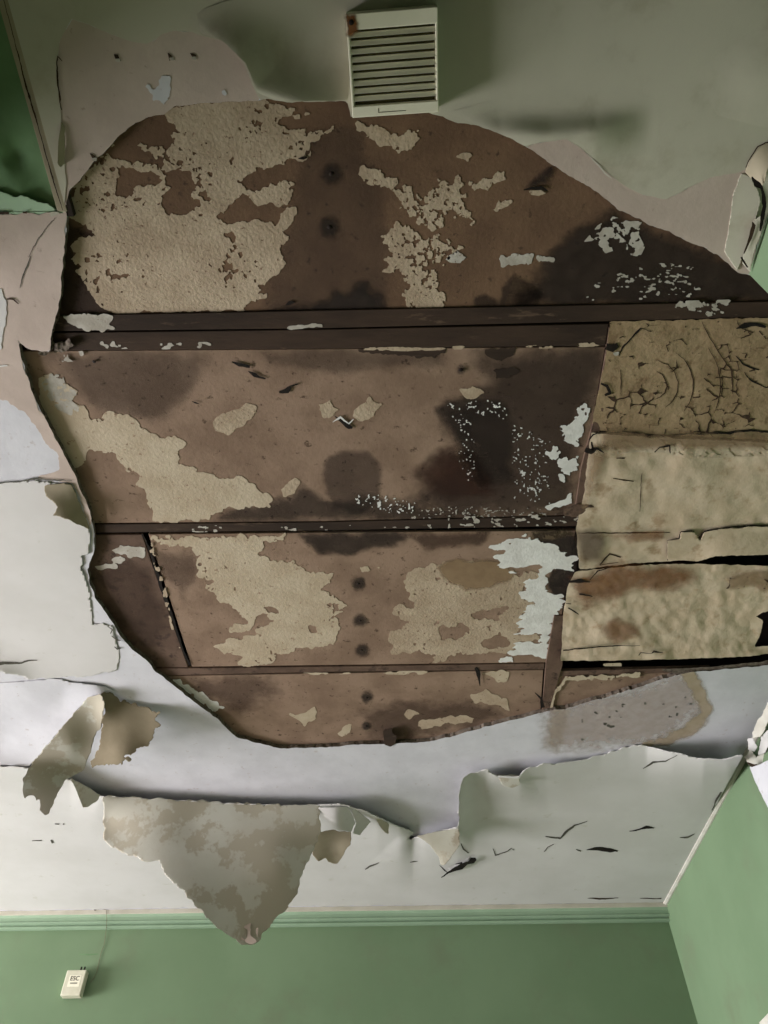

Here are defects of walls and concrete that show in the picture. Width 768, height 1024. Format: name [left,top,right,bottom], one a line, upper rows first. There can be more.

flaking render [0,11,259,529]
peeling [392,175,475,266]
leakage [475,212,768,307]
flaking render [528,139,768,300]
leakage [192,351,601,599]
peeling [545,446,561,460]
crack [566,321,768,615]
flaking render [667,526,768,561]
leakage [549,672,712,747]
flaking render [0,641,768,945]
crack [410,844,514,878]
crack [544,821,653,852]